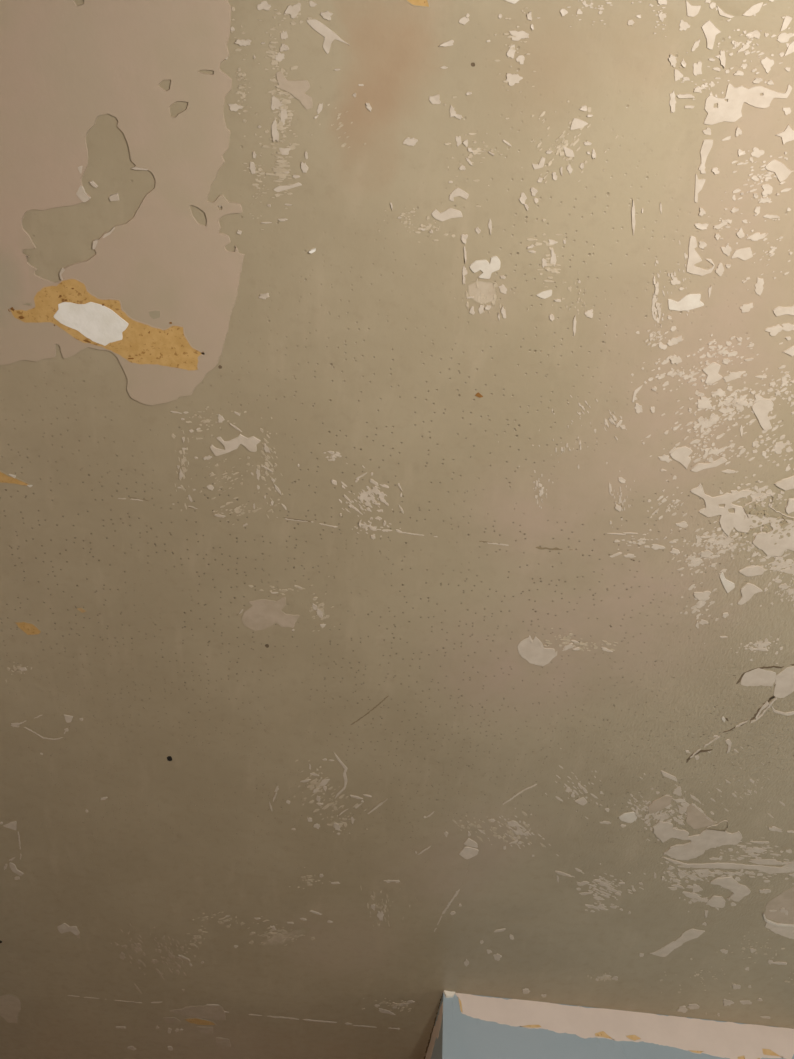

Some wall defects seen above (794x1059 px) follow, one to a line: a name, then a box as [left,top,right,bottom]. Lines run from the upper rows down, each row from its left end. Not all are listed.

peeling [486,0,540,92]
peeling [519,105,607,210]
peeling [0,0,353,527]
peeling [378,133,511,320]
peeling [527,219,593,335]
peeling [607,0,794,628]
peeling [331,465,404,540]
crack [685,664,794,763]
peeling [269,751,388,835]
peeling [444,808,559,859]
peeling [545,746,794,985]
peeling [425,966,794,1059]